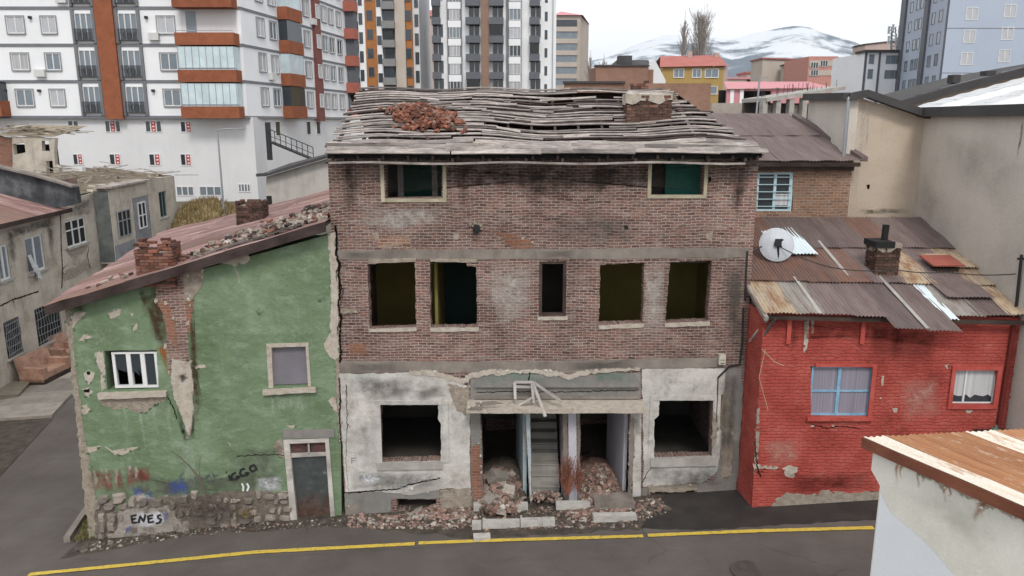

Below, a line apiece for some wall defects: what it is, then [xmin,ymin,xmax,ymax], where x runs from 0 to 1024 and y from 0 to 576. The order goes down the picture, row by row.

spalling [64,268,204,538]
peeling [324,232,367,442]
crack [334,225,440,493]
spalling [409,367,640,416]
peeling [753,407,799,480]
peeling [772,489,879,506]